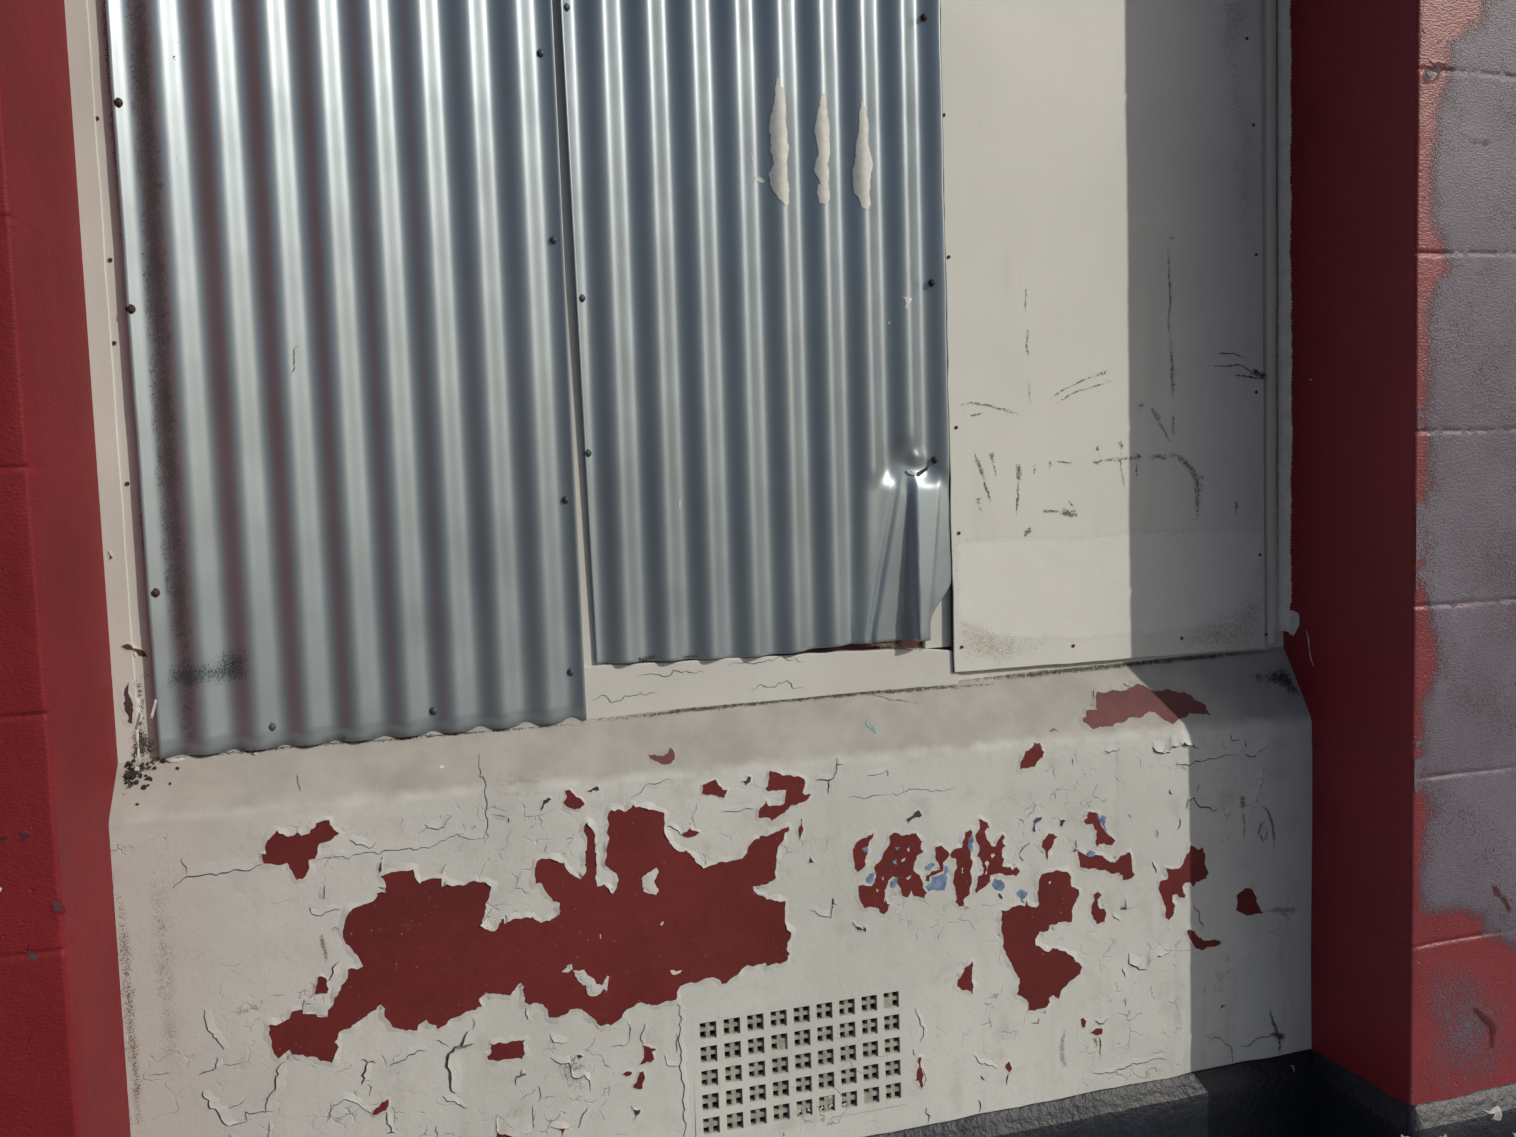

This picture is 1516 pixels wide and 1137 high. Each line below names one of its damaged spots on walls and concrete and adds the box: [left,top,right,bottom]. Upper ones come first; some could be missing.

crack [816,759,952,799]
peeling [1078,679,1214,754]
crack [173,857,262,888]
crack [310,754,510,981]
peeling [258,766,815,1068]
crack [810,898,838,918]
peeling [847,808,1139,1015]
peeling [1128,841,1223,970]
peeling [1233,882,1266,921]
crack [154,1009,291,1137]
crack [327,1021,476,1137]
crack [515,1002,691,1137]